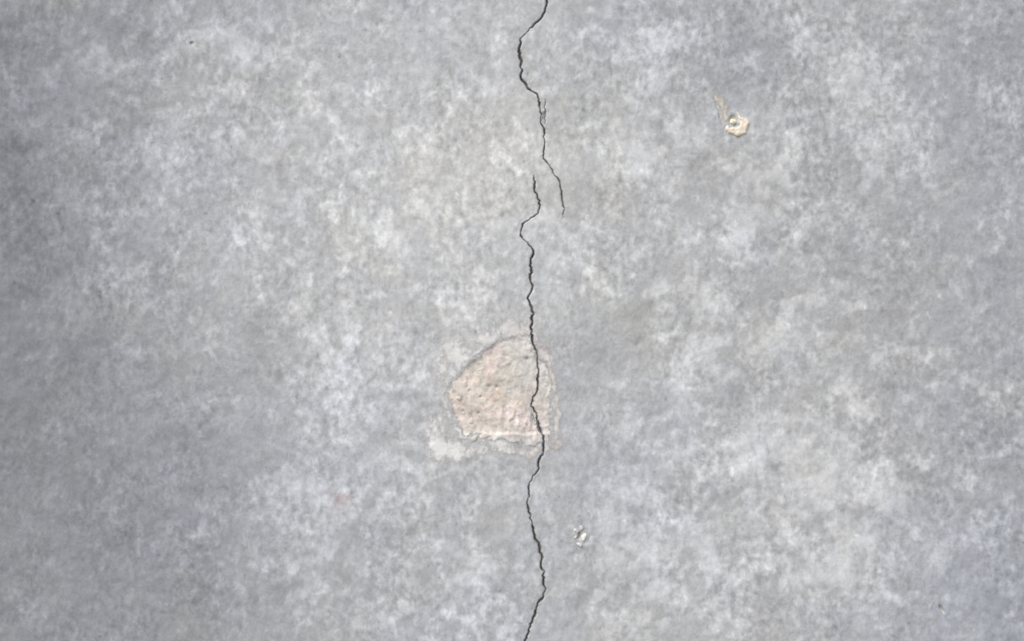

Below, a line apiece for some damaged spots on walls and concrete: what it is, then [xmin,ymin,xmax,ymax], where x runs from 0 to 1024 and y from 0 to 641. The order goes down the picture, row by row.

spalling [421,318,563,463]
crack [515,0,568,641]